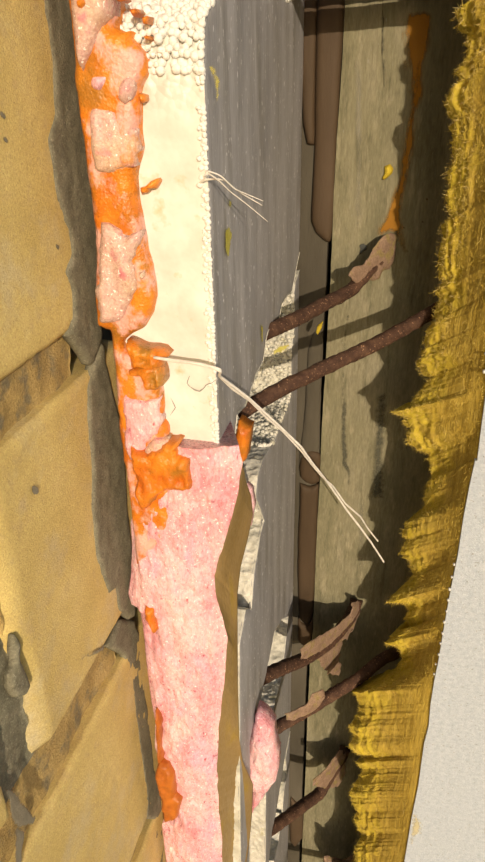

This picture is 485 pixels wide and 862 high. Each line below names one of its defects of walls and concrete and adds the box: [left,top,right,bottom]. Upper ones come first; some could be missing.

corrosion [380,13,430,246]
spalling [280,270,300,317]
spalling [252,332,294,393]
spalling [238,395,289,740]
spalling [232,732,290,862]